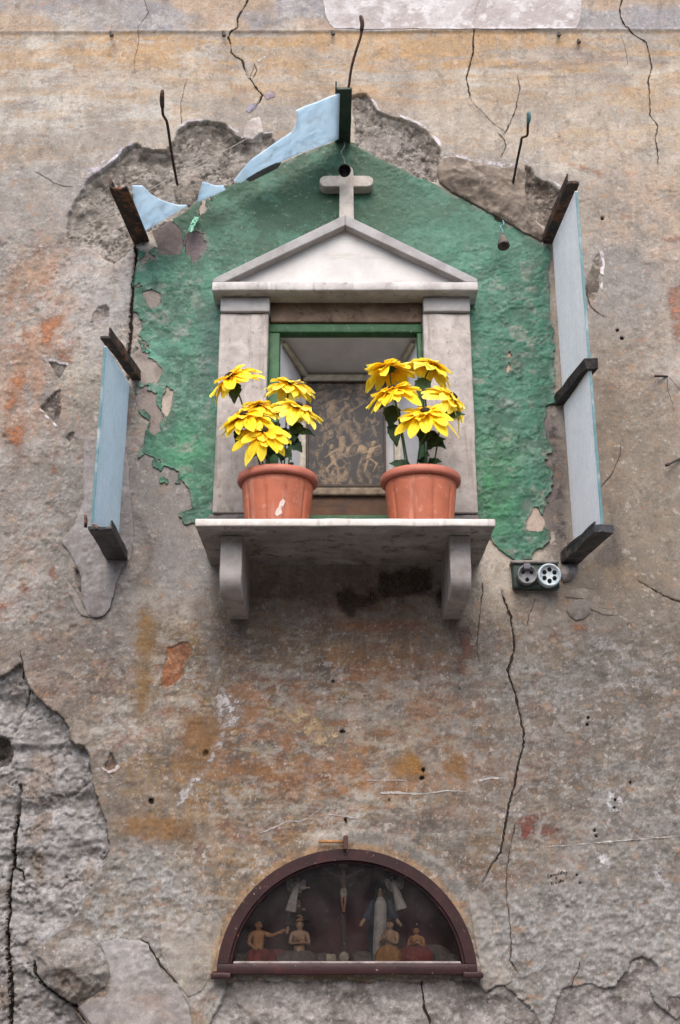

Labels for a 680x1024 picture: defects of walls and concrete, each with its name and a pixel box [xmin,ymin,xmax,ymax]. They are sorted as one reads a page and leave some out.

crack [227,0,264,105]
crack [466,5,521,155]
crack [619,0,659,162]
spalling [68,91,276,264]
spalling [352,96,441,183]
spalling [524,159,561,228]
peeling [142,289,161,309]
peeling [127,352,173,435]
peeling [526,507,556,544]
spalling [161,642,192,686]
crack [476,582,535,976]
spalling [0,667,120,1024]